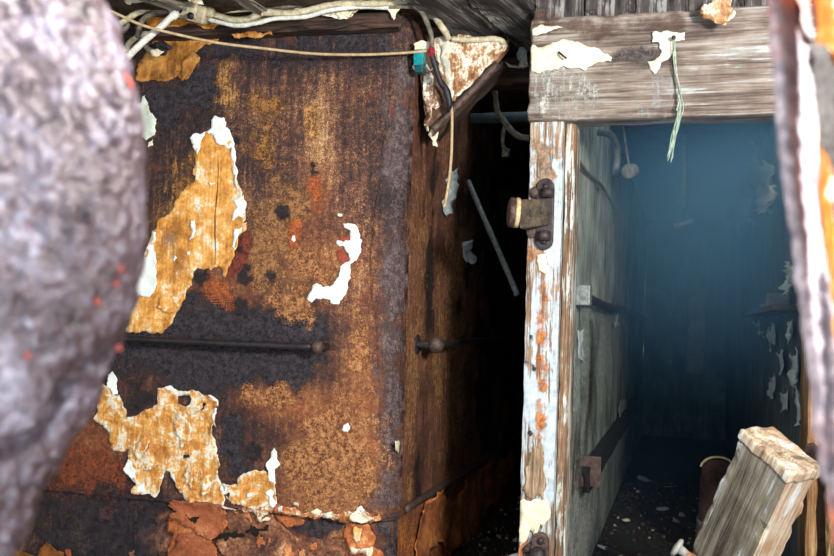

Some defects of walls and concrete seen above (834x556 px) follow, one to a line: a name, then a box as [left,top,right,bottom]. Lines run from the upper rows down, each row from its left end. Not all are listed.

corrosion [214,60,238,116]
peeling [506,24,612,113]
peeling [647,30,685,74]
corrosion [153,150,195,225]
peeling [126,116,247,334]
corrosion [202,93,340,330]
peeling [307,213,362,304]
peeling [93,371,382,524]
corrosion [241,381,297,420]
corrosion [276,177,516,514]
peeling [519,434,551,546]
corrosion [535,311,549,448]